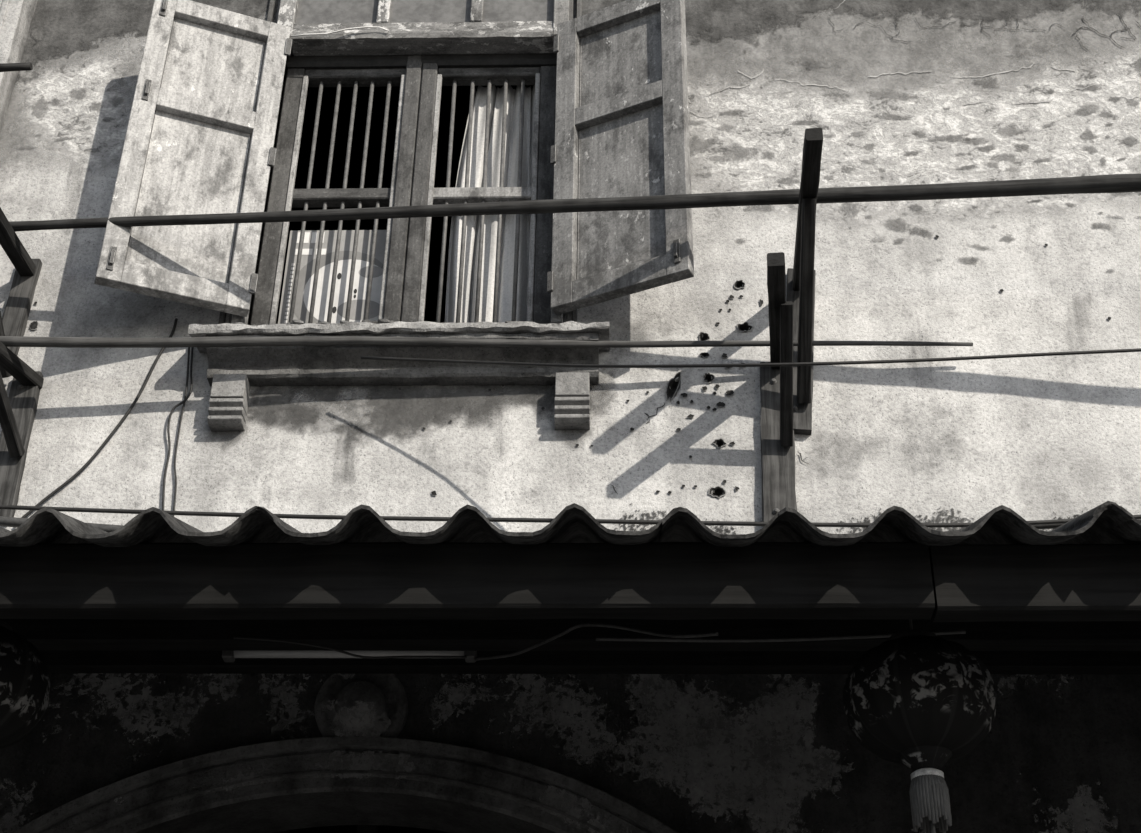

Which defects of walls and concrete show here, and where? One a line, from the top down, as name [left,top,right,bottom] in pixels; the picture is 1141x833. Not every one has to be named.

crack [829,13,1141,51]
peeling [19,38,145,170]
peeling [688,43,1141,193]
peeling [747,204,798,214]
peeling [816,192,1141,244]
peeling [959,244,989,264]
water stain [212,431,241,443]
water stain [247,384,555,441]
water stain [562,430,587,443]
peeling [425,674,855,833]